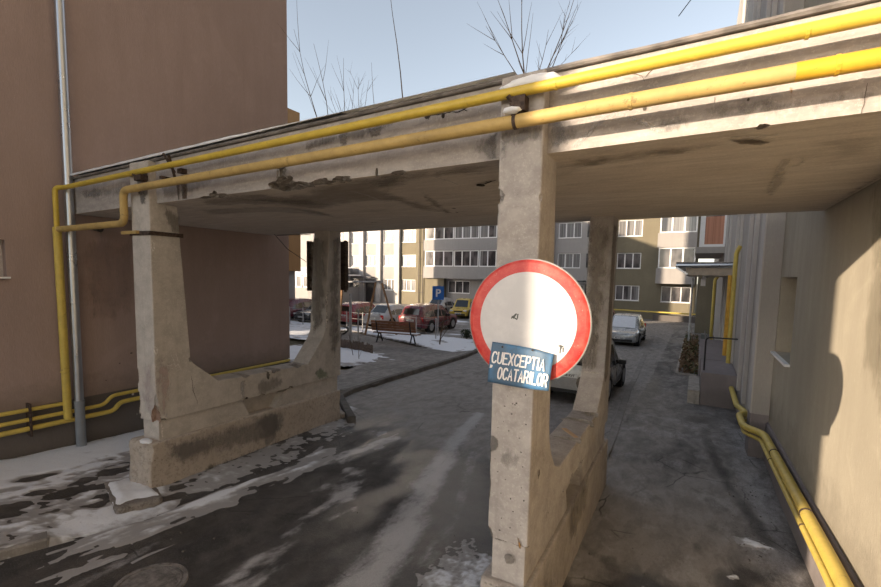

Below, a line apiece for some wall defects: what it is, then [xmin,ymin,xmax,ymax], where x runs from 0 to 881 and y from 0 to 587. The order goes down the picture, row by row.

spalling [268,167,352,191]
spalling [132,368,166,423]
leakage [172,415,277,459]